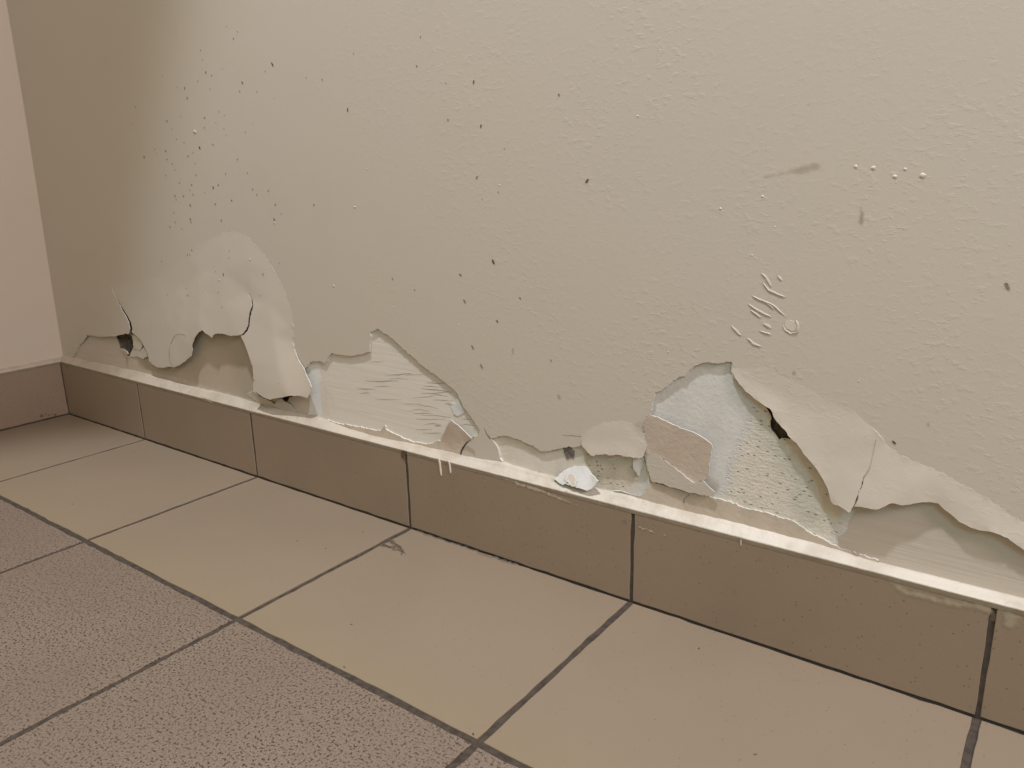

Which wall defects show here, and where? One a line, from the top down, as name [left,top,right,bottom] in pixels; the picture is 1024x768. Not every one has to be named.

peeling [71,220,480,454]
peeling [493,362,1024,562]